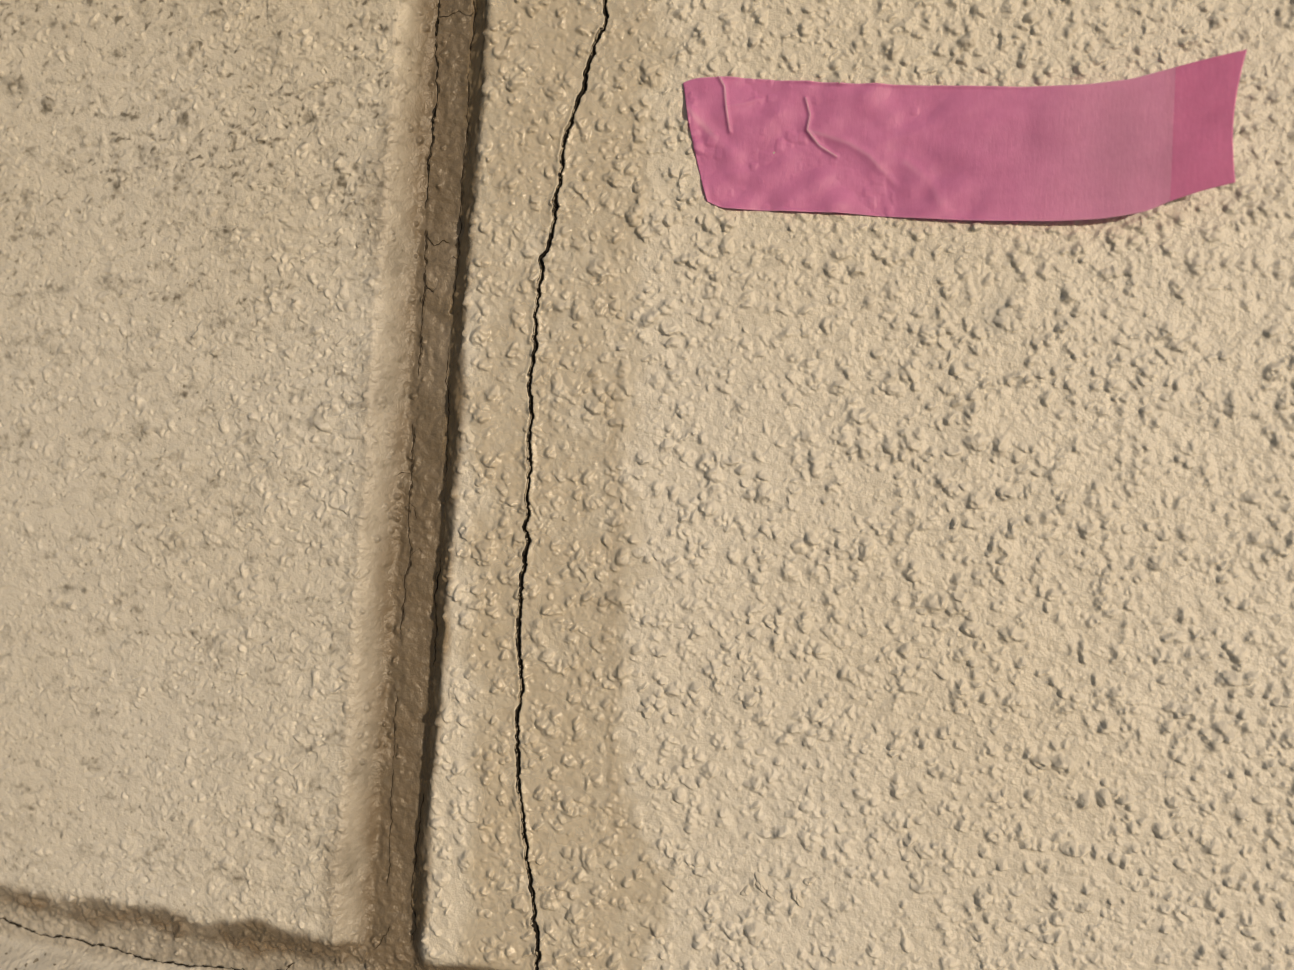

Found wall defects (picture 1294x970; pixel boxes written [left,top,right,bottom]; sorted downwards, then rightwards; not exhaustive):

crack [418,0,476,475]
crack [396,425,442,665]
crack [515,0,609,970]
crack [0,918,245,970]
crack [377,696,424,947]